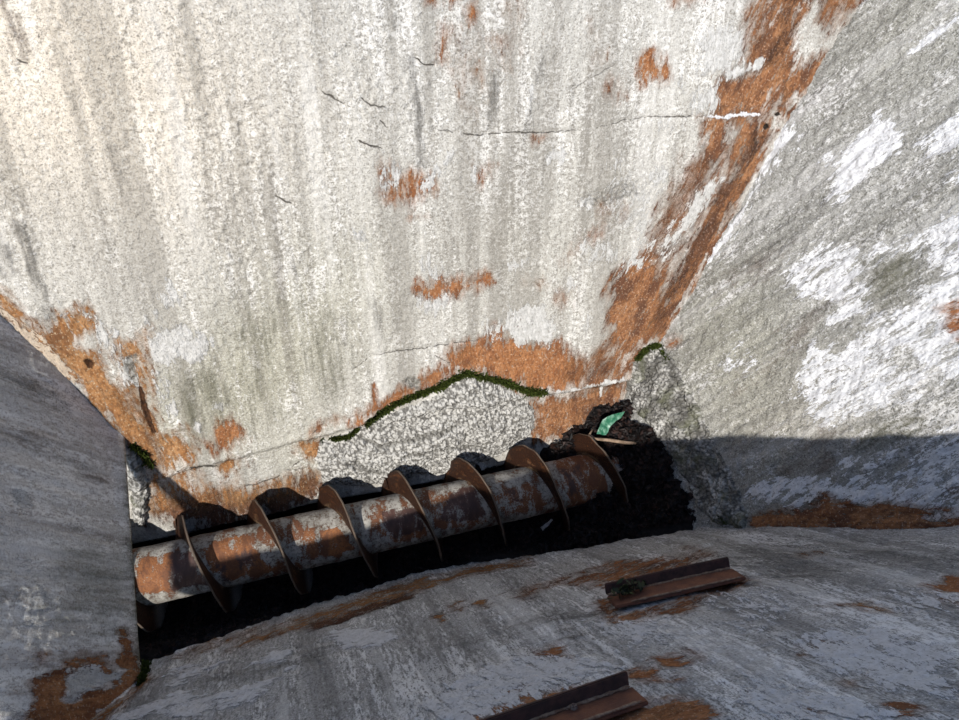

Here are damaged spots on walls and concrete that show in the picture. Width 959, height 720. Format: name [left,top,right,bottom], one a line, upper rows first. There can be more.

crack [440,129,569,137]
corrosion [335,0,864,447]
corrosion [0,294,324,534]
corrosion [748,491,959,530]
corrosion [502,545,749,624]
corrosion [172,555,533,660]
corrosion [22,628,152,720]
corrosion [536,647,570,659]
corrosion [626,649,697,684]
corrosion [607,695,721,720]
corrosion [881,701,922,717]